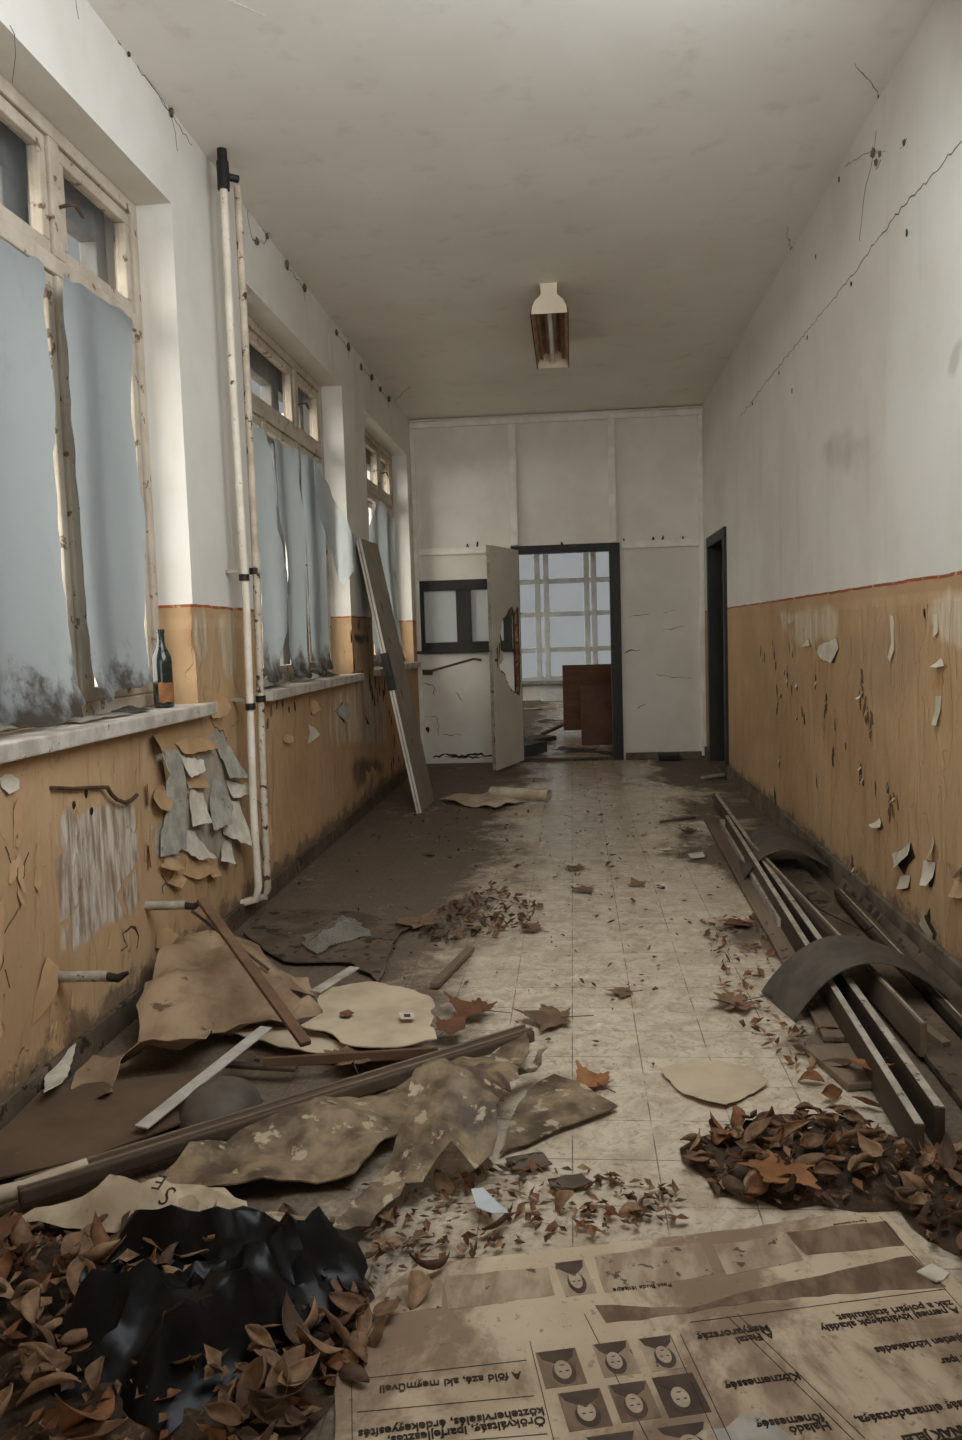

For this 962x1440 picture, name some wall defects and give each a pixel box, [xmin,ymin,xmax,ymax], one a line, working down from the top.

crack [117,40,193,146]
crack [741,141,962,415]
peeling [930,657,947,670]
peeling [760,638,846,767]
peeling [856,669,873,740]
peeling [931,695,942,727]
peeling [857,764,899,830]
flaking render [0,684,273,1025]
peeling [891,835,962,900]
peeling [919,908,937,940]
flaking render [43,1043,76,1092]